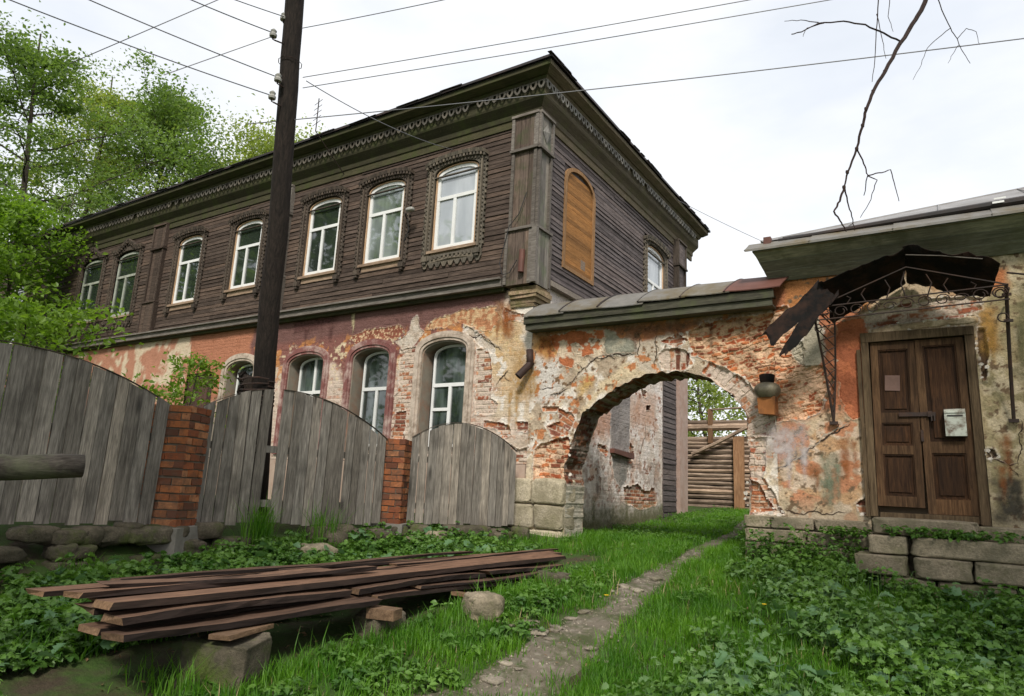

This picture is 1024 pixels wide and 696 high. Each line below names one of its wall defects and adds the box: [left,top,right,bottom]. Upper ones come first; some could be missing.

peeling [548,329,614,368]
crack [543,334,658,395]
spalling [351,306,575,480]
spalling [658,295,990,516]
water stain [770,427,807,477]
spalling [615,480,657,510]
water stain [996,477,1023,521]